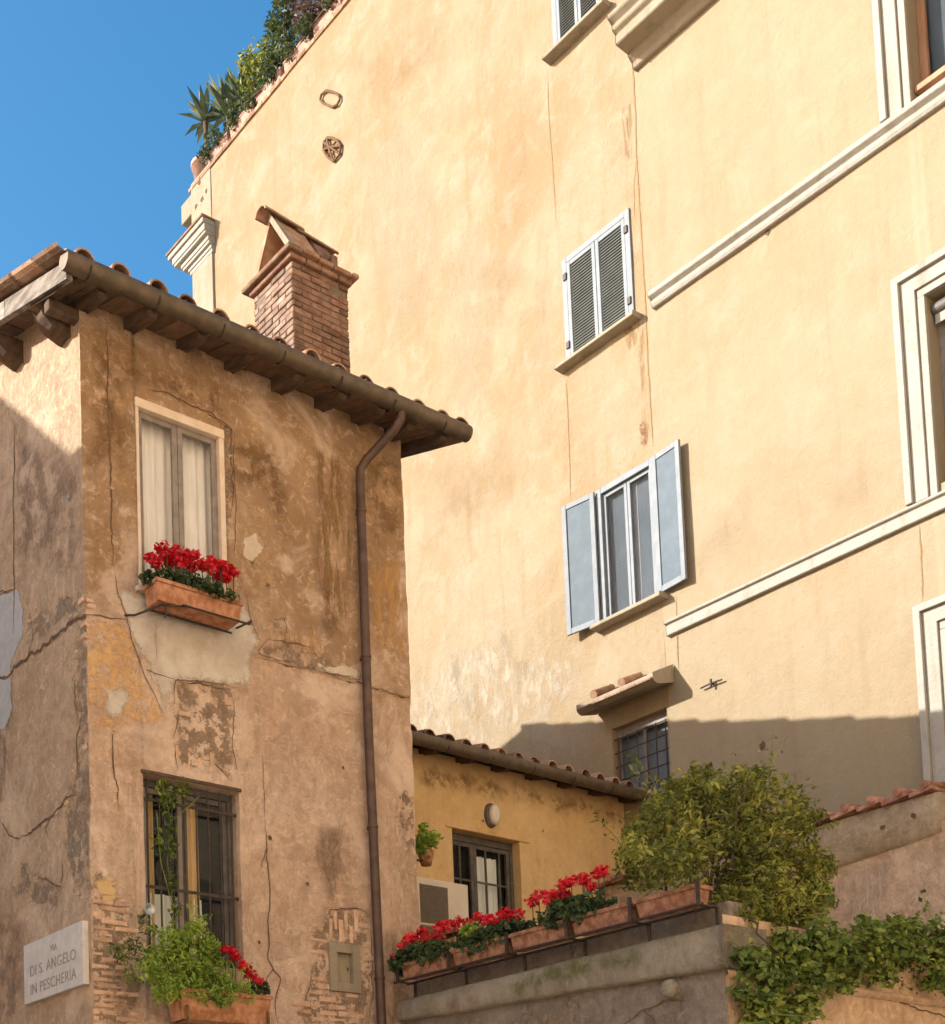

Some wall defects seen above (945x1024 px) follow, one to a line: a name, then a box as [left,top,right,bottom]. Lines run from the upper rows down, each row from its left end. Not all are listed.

crack [632,68,653,447]
crack [0,329,173,708]
crack [152,390,237,553]
crack [0,704,82,842]
flaking render [26,593,141,1024]
peeling [114,590,361,779]
crack [261,755,284,1022]
flaking render [291,908,374,1024]